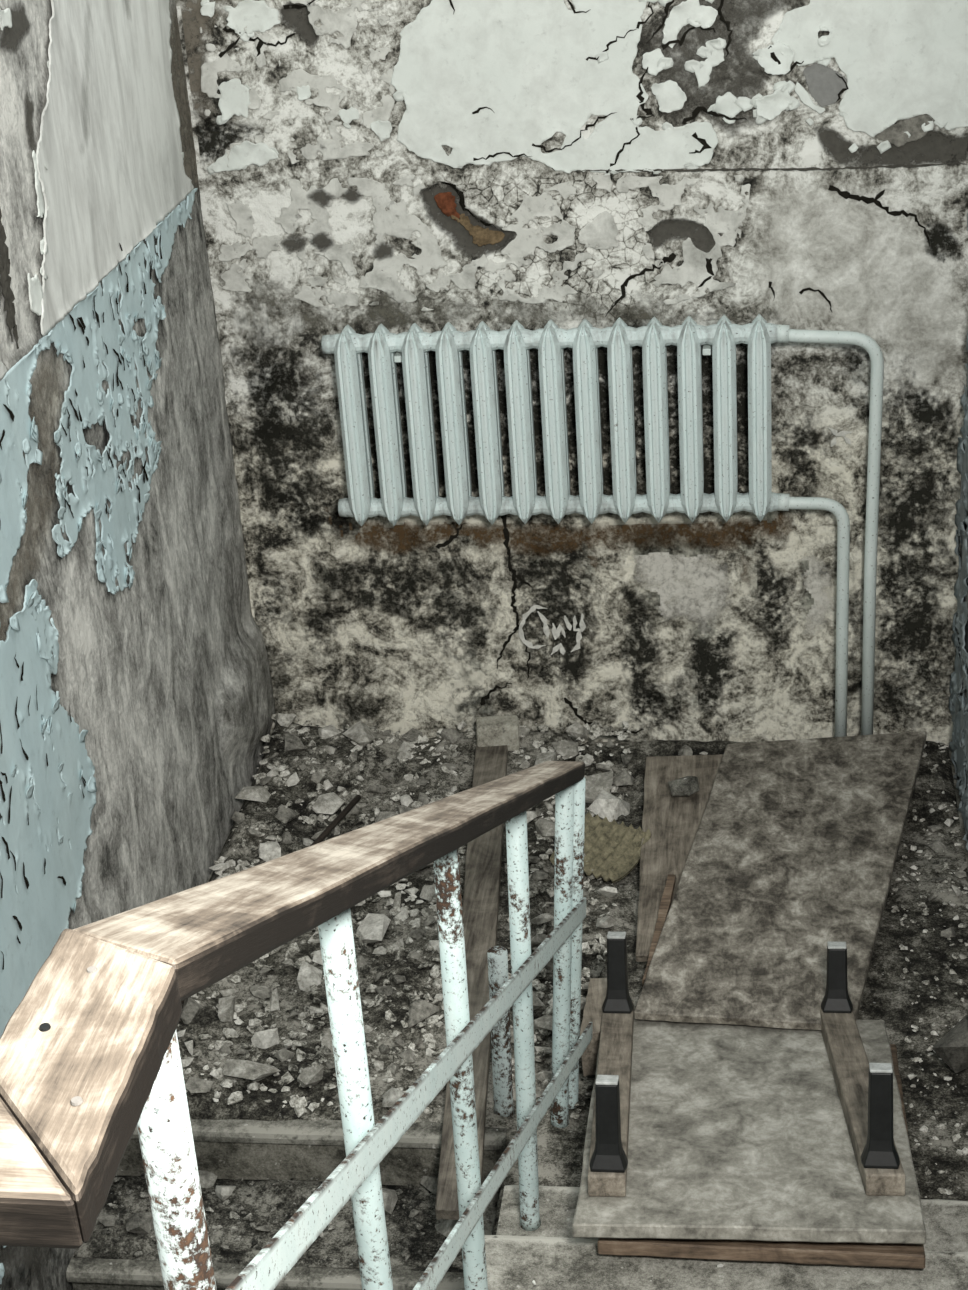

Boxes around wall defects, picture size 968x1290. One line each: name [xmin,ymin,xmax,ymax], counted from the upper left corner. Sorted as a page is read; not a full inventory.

crack [567,0,591,13]
crack [586,2,654,61]
crack [473,112,966,246]
peeling [0,0,968,603]
water stain [225,283,471,537]
water stain [529,348,545,496]
water stain [598,347,613,496]
water stain [701,345,715,494]
water stain [609,552,737,742]
water stain [848,389,960,725]
peeling [949,332,968,851]
peeling [0,579,97,1037]